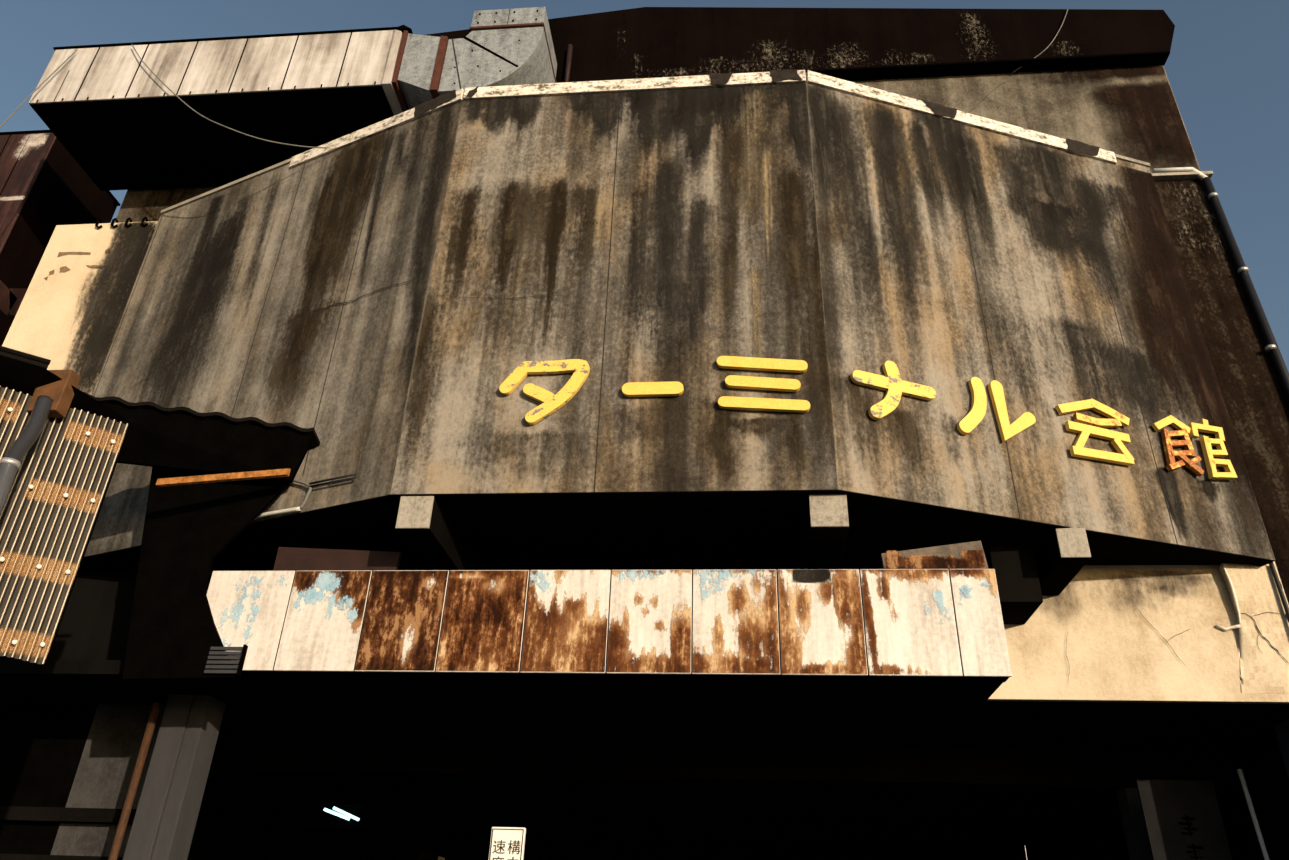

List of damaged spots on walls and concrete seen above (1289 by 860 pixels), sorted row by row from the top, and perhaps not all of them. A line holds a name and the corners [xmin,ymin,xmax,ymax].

water stain [66,187,195,395]
water stain [143,186,277,408]
water stain [263,96,605,462]
water stain [566,66,1272,549]
water stain [486,432,582,475]
peeling [530,570,553,592]
peeling [617,570,665,582]
rust [293,550,997,674]
water stain [1146,570,1200,593]
crack [1235,583,1288,662]